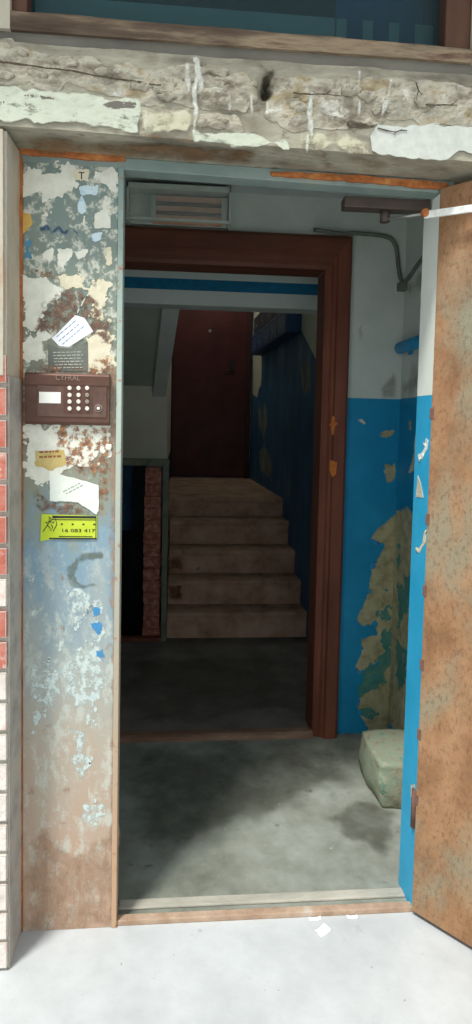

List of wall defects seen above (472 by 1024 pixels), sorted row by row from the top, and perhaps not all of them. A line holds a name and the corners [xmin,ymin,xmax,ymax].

crack [0,61,161,86]
water stain [185,57,203,126]
spalling [0,38,472,160]
crack [416,82,457,106]
rust [270,171,449,190]
rust [17,148,126,381]
rust [57,358,116,509]
rust [37,493,82,515]
flaking render [354,505,427,730]
peeling [30,588,107,776]
peeling [82,799,105,826]